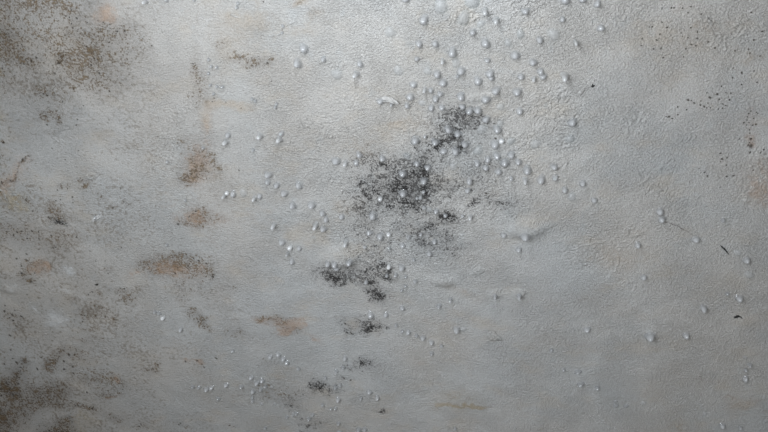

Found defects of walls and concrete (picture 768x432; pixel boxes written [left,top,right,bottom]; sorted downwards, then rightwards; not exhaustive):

leakage [0,0,142,133]
leakage [311,107,510,303]